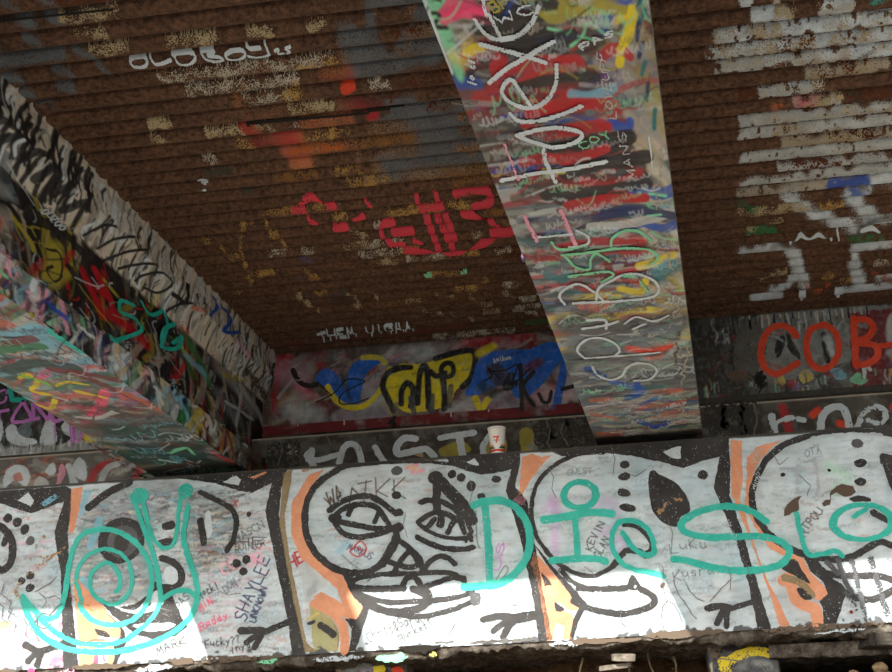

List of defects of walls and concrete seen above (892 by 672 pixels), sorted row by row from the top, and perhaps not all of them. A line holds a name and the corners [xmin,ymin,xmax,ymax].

corrosion [776,35,816,54]
corrosion [817,59,868,79]
corrosion [826,128,875,144]
corrosion [791,157,842,171]
corrosion [495,245,525,263]
spalling [168,655,284,665]